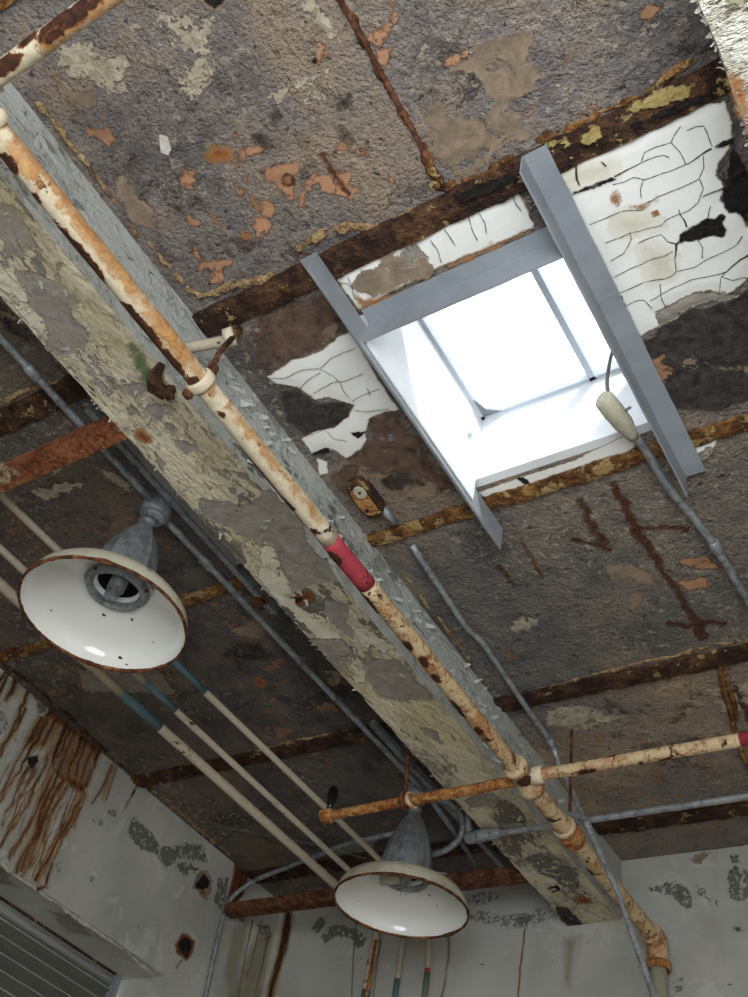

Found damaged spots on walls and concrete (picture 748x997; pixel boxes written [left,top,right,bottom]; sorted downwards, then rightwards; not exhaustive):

peeling [291,0,338,65]
rust [336,0,445,190]
peeling [424,29,695,192]
peeling [690,0,746,82]
peeling [561,100,748,420]
crack [590,126,748,309]
crack [267,348,387,412]
peeling [479,436,636,497]
rust [570,498,612,552]
rust [610,481,728,641]
peeling [695,439,718,461]
rust [0,671,115,891]